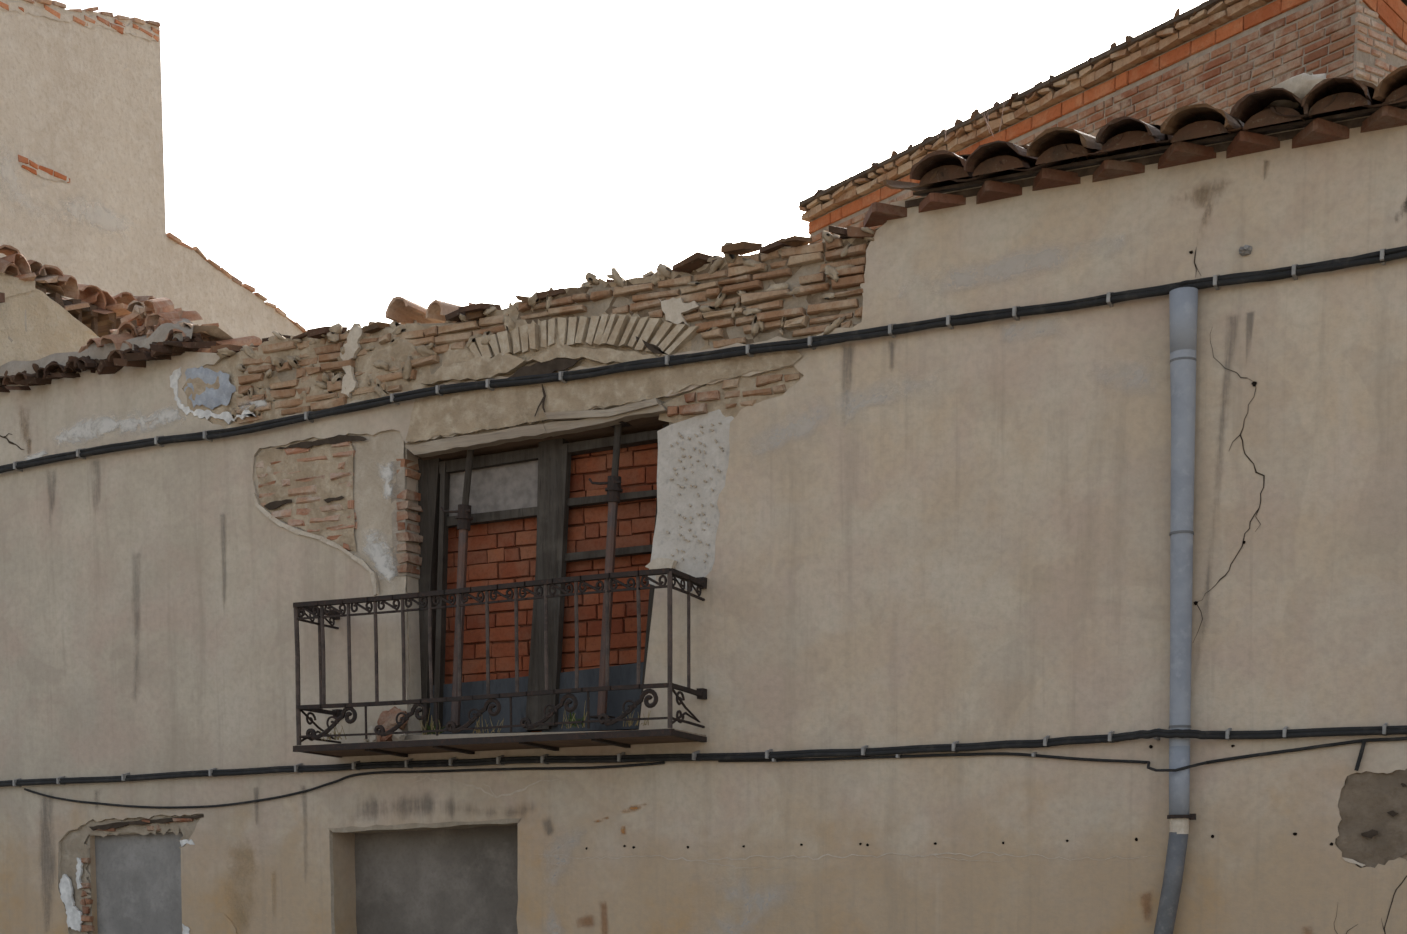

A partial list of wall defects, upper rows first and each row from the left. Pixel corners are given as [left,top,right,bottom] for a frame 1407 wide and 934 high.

spalling [0,0,160,42]
spalling [18,155,70,183]
spalling [253,344,804,615]
crack [1193,329,1265,642]
spalling [59,814,204,934]
spalling [1335,769,1407,868]